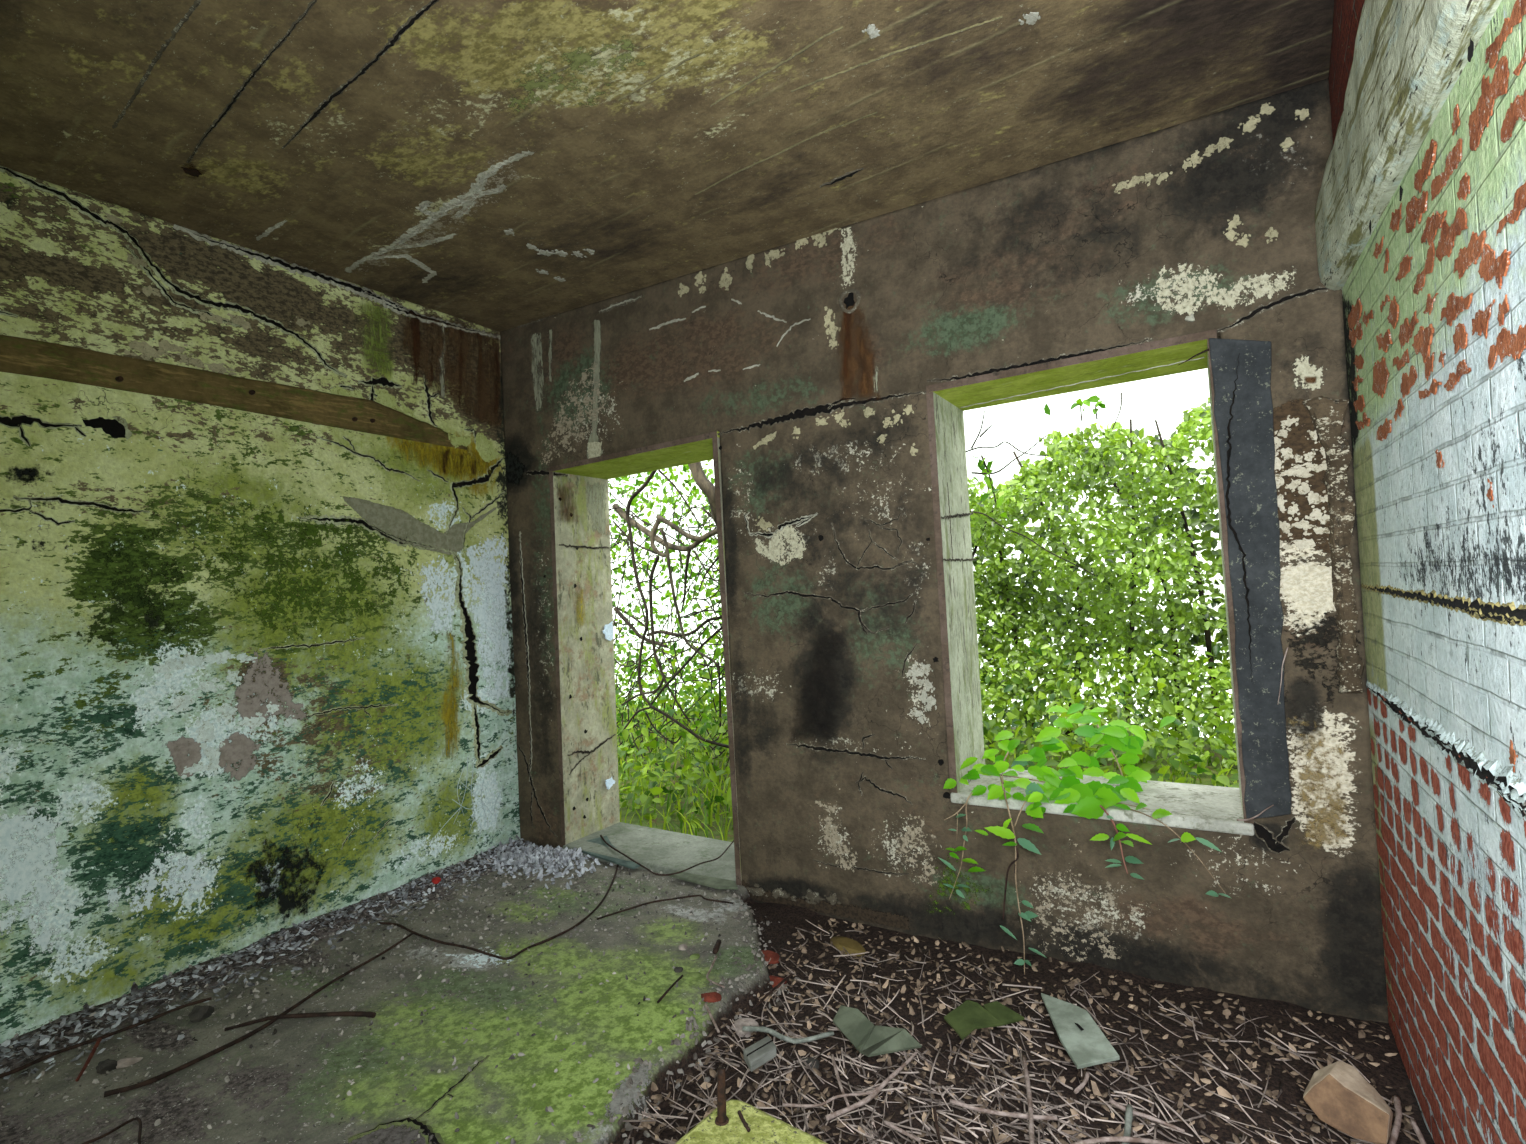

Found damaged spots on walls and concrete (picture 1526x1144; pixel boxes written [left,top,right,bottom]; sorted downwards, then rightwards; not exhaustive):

damp [344,148,534,283]
damp [839,227,858,286]
rust [841,306,878,398]
peeling [1153,263,1296,315]
peeling [1340,0,1526,441]
crack [0,166,616,838]
crack [1217,286,1331,682]
peeling [1273,354,1331,556]
damp [417,533,511,701]
crack [1361,583,1526,626]
crack [1366,678,1526,821]
peeling [1367,688,1526,1144]